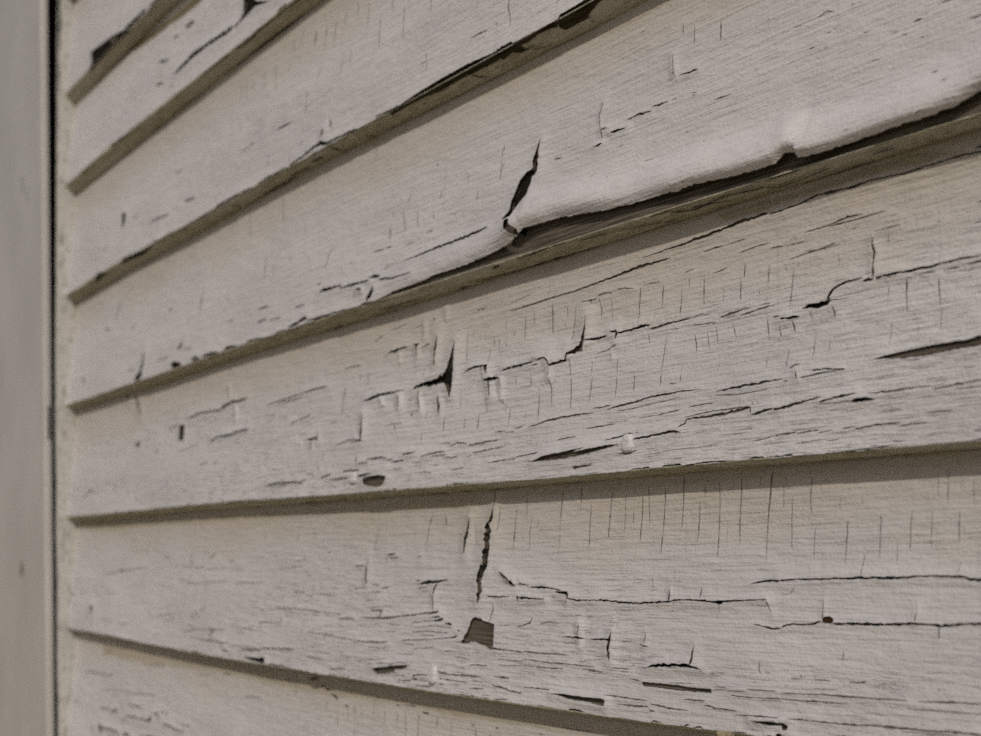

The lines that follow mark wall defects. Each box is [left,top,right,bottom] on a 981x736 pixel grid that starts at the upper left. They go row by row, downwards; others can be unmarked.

spalling [90,30,130,71]
spalling [245,0,267,17]
crack [460,131,953,289]
peeling [591,109,954,227]
crack [192,274,419,360]
peeling [384,263,475,298]
crack [367,279,705,427]
crack [766,237,981,382]
crack [852,395,874,403]
peeling [364,475,385,486]
crack [475,446,981,638]
crack [566,636,699,669]